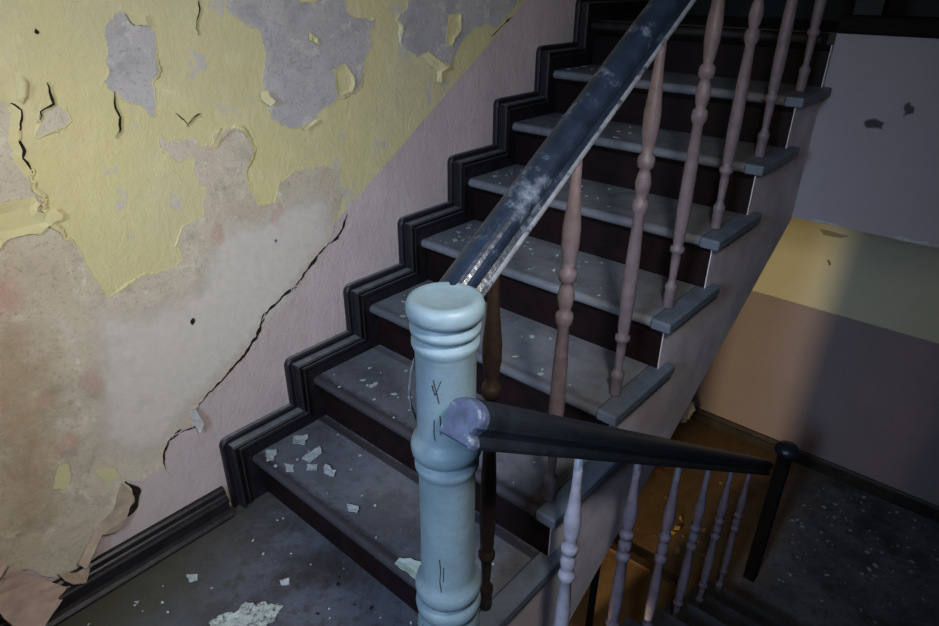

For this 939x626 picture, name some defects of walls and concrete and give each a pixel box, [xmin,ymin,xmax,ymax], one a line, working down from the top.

peeling [103,11,162,118]
peeling [225,0,375,131]
peeling [396,0,521,83]
peeling [0,100,344,579]
water stain [100,200,327,449]
crack [163,215,347,469]